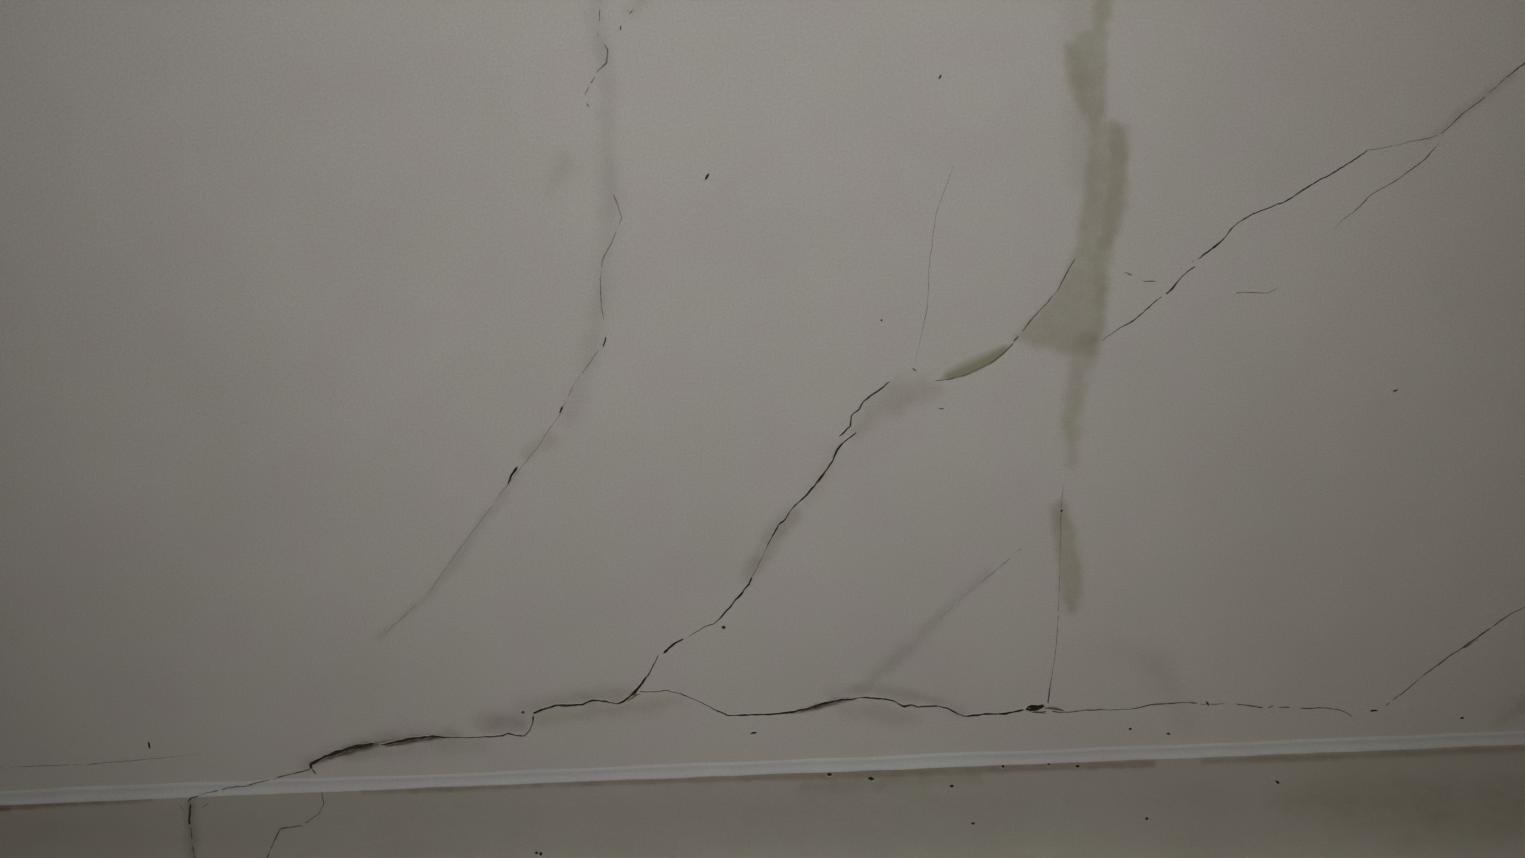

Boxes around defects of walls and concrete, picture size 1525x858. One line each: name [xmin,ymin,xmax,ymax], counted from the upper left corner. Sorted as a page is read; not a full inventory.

crack [585,0,643,107]
crack [1103,63,1525,340]
crack [179,171,1525,858]